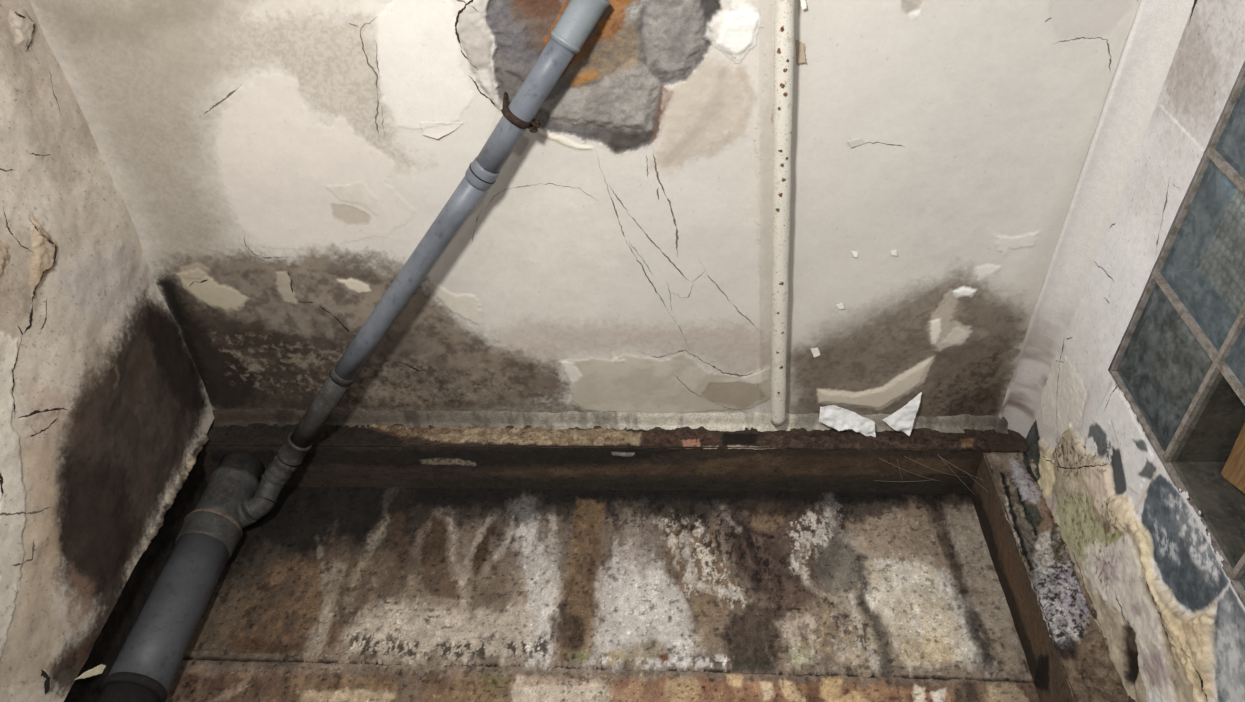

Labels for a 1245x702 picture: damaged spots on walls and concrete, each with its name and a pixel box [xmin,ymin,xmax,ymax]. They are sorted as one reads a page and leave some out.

peeling [373,0,539,140]
crack [455,0,501,111]
rust [503,0,570,56]
rust [562,0,643,90]
spalling [534,0,763,156]
crack [3,209,70,437]
damp [333,273,584,413]
crack [469,147,762,412]
damp [636,0,1036,417]
damp [38,237,409,702]
damp [167,487,1025,702]
spalling [998,352,1221,702]